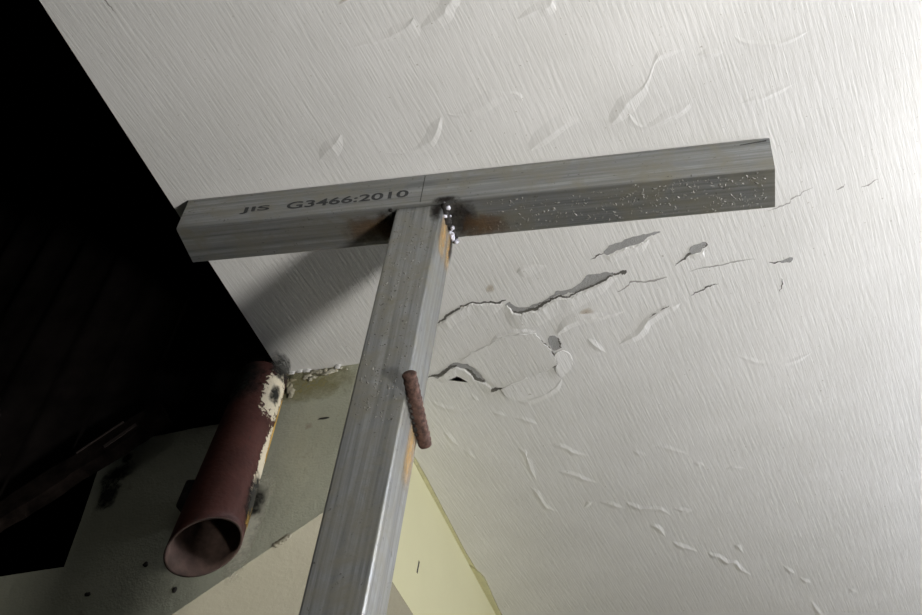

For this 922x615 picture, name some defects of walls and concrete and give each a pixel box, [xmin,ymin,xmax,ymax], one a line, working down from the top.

peeling [590,231,660,263]
peeling [675,242,708,266]
peeling [428,329,573,406]